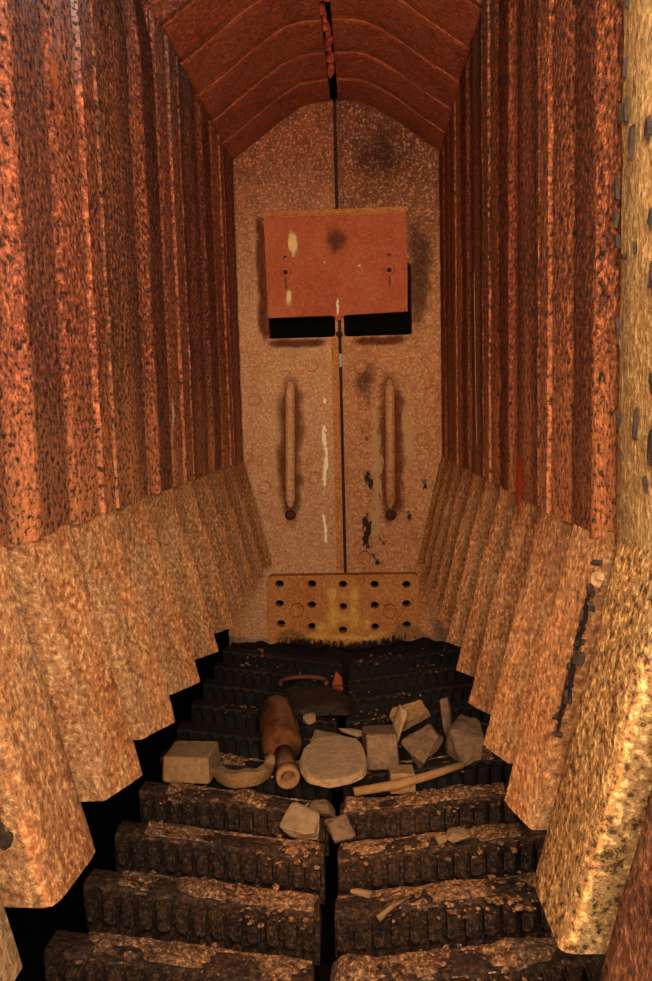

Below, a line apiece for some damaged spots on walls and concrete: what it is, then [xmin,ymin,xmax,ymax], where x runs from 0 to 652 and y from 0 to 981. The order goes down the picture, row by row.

crack [320,1,337,95]